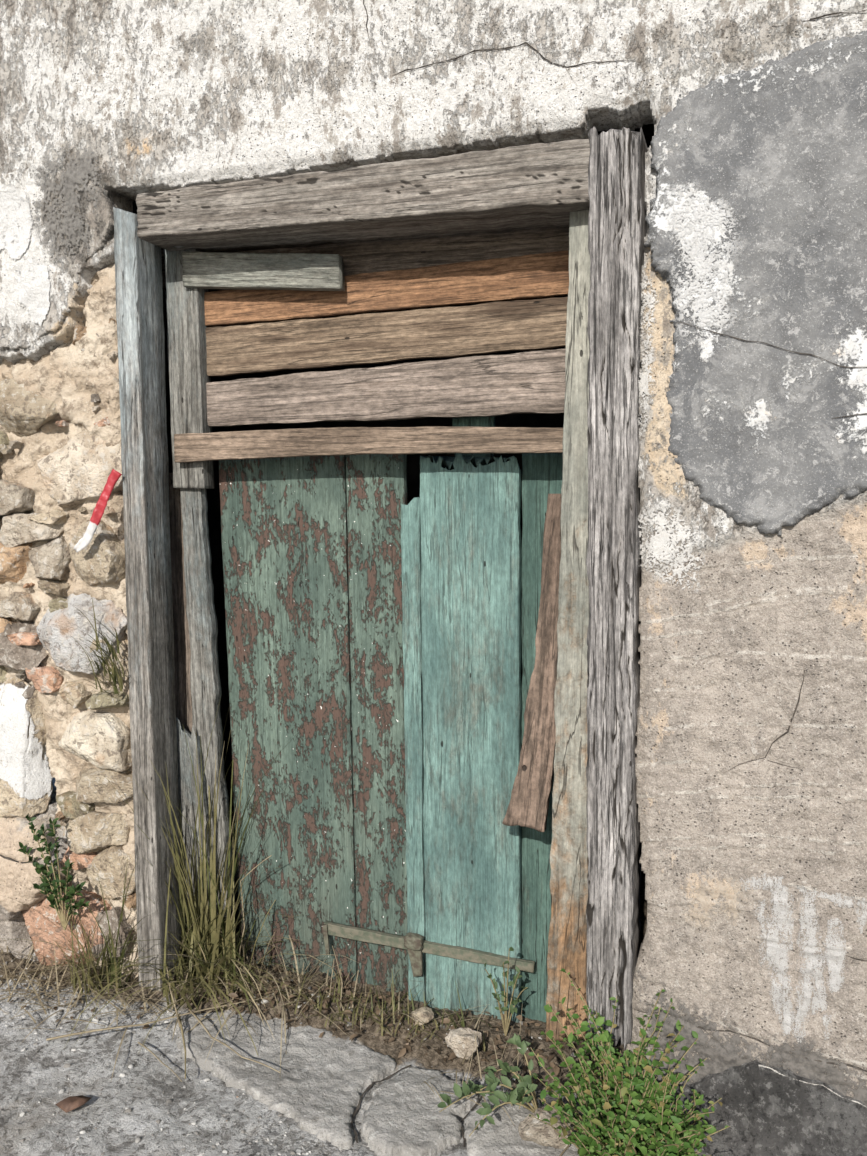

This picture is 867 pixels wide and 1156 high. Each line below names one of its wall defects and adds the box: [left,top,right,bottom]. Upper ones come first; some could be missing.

crack [392,42,640,84]
peeling [668,186,738,344]
spalling [0,166,139,979]
crack [728,670,805,771]
crack [632,1008,867,1107]